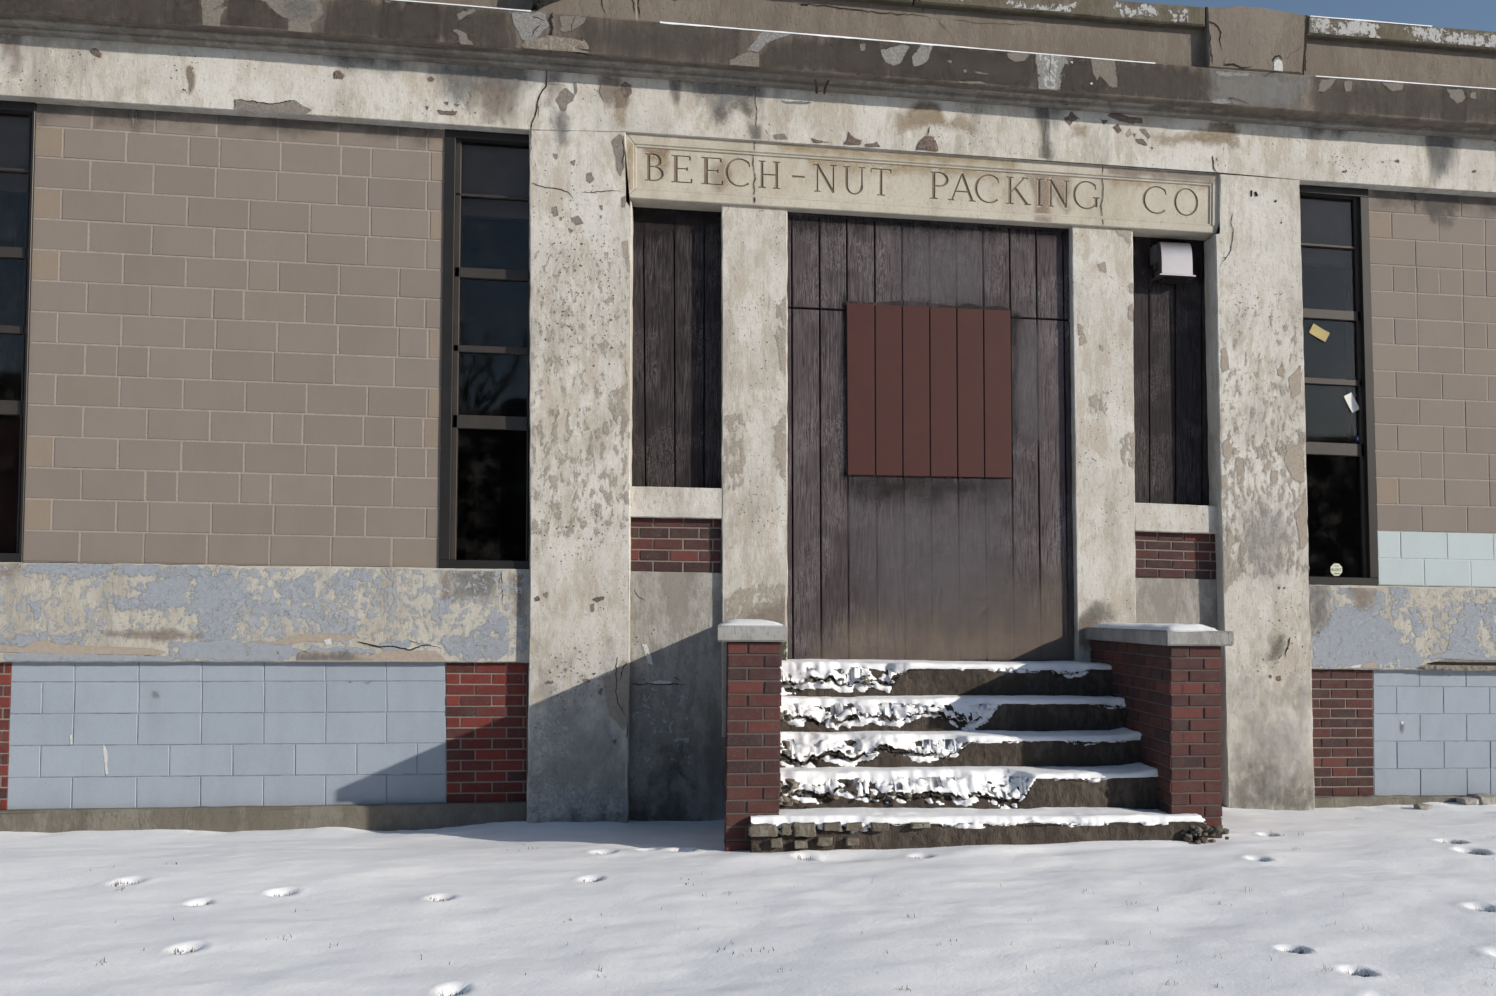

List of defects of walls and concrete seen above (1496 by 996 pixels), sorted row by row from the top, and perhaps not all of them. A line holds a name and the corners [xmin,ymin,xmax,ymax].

peeling [201,0,227,27]
peeling [262,0,324,33]
spalling [509,11,595,54]
peeling [729,31,790,67]
peeling [860,43,933,66]
peeling [1007,52,1154,149]
peeling [550,75,594,183]
peeling [611,134,625,176]
peeling [530,205,630,562]
peeling [1220,283,1496,681]
peeling [0,563,548,662]
crack [359,640,440,651]